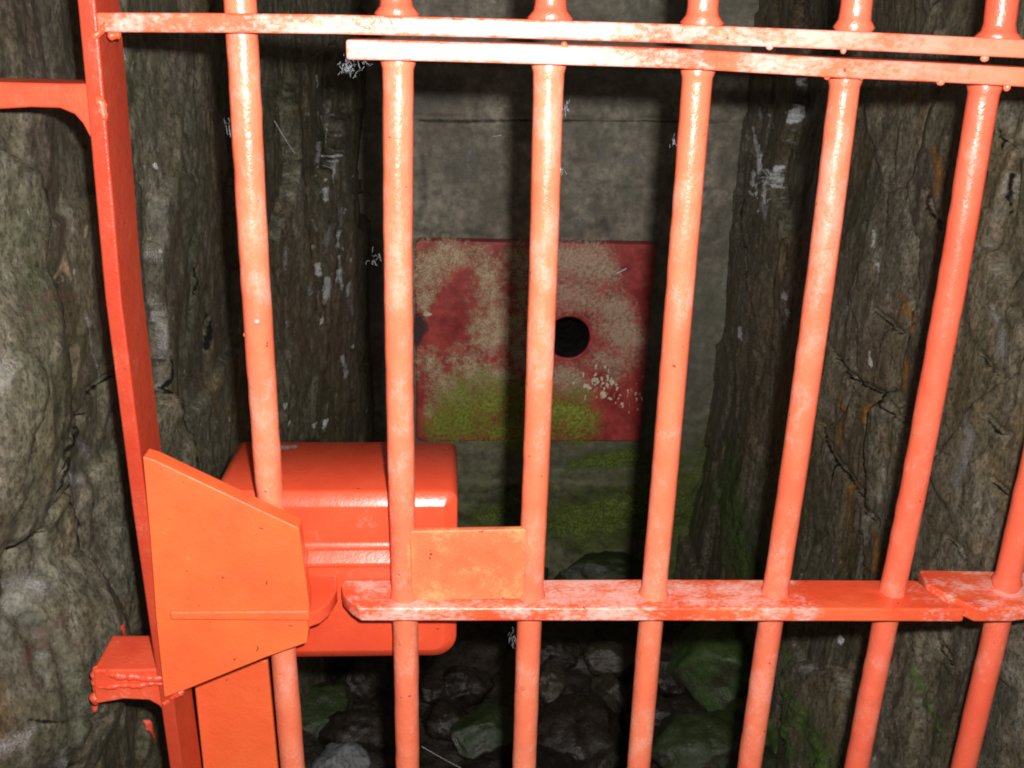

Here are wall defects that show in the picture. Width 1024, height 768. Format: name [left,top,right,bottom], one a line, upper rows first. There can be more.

peeling [553,239,651,410]